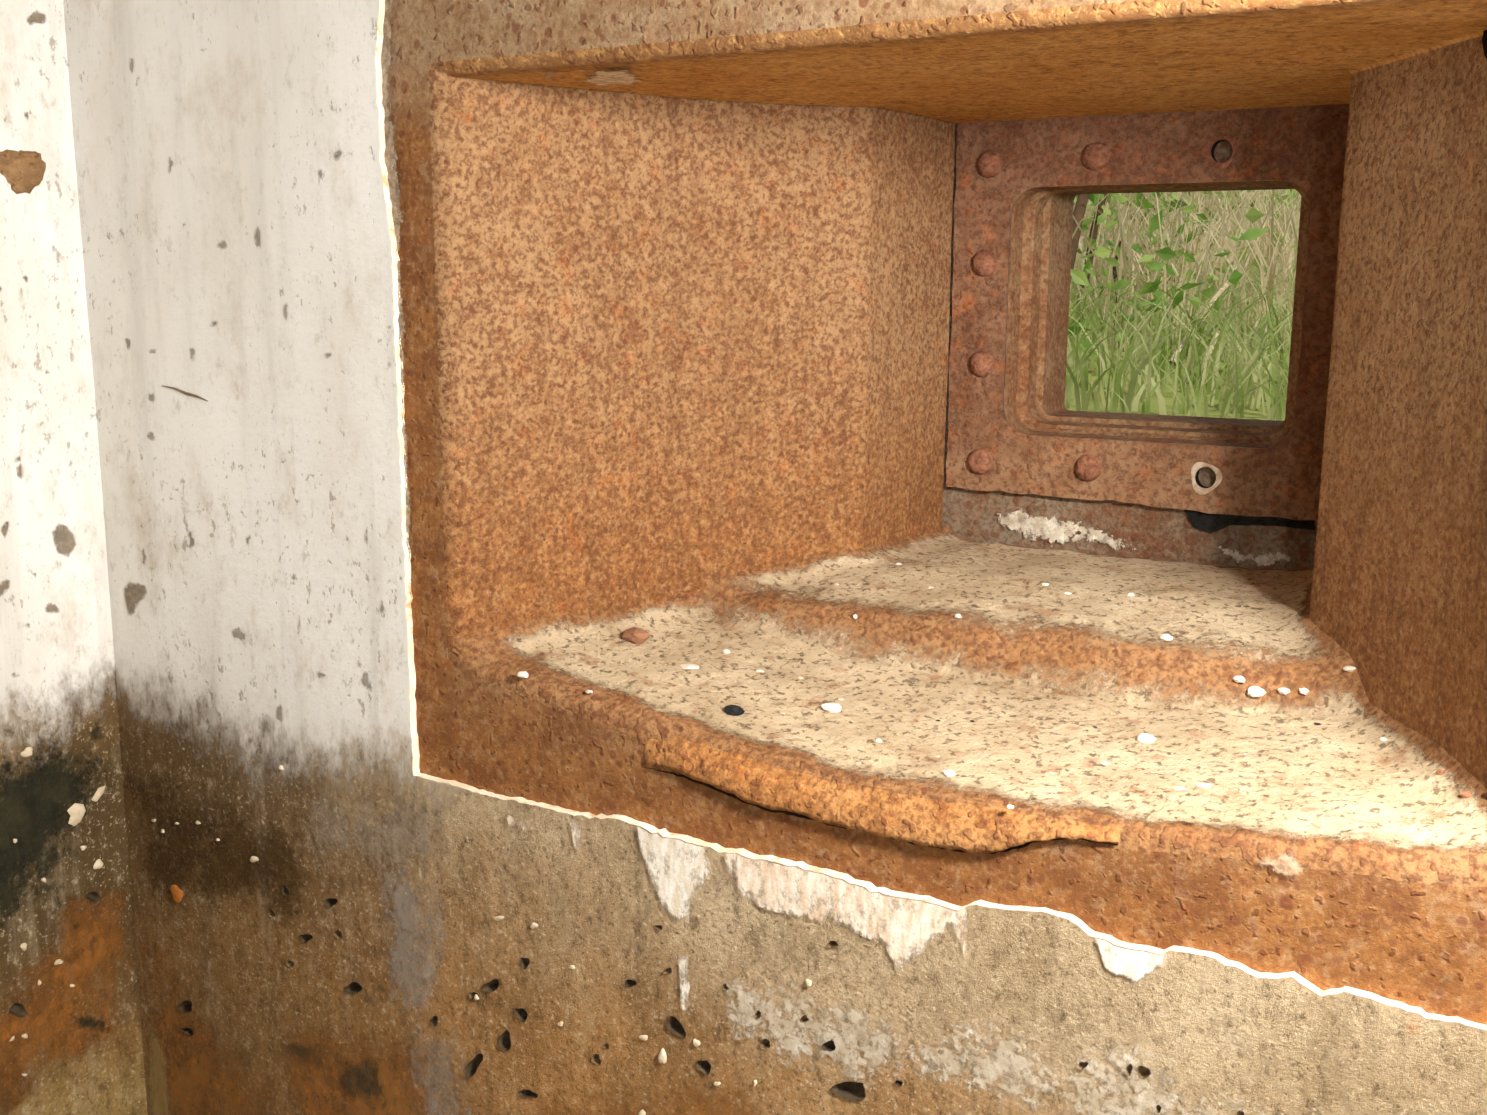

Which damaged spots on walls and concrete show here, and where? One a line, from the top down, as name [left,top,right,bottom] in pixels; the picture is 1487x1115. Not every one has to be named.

water stain [0,671,1487,1115]
crack [644,767,1118,854]